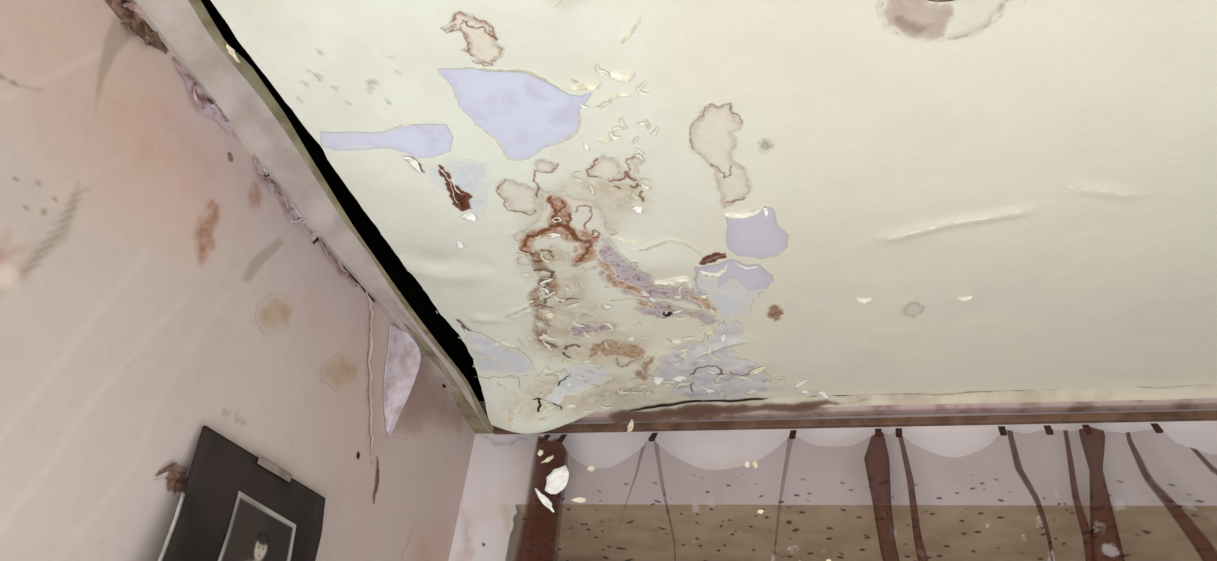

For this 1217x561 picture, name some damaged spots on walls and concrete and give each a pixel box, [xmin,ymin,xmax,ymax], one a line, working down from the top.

water stain [440,11,505,67]
water stain [86,52,264,270]
peeling [320,122,495,223]
peeling [438,64,658,215]
water stain [689,103,752,209]
peeling [456,206,829,429]
water stain [479,153,838,447]